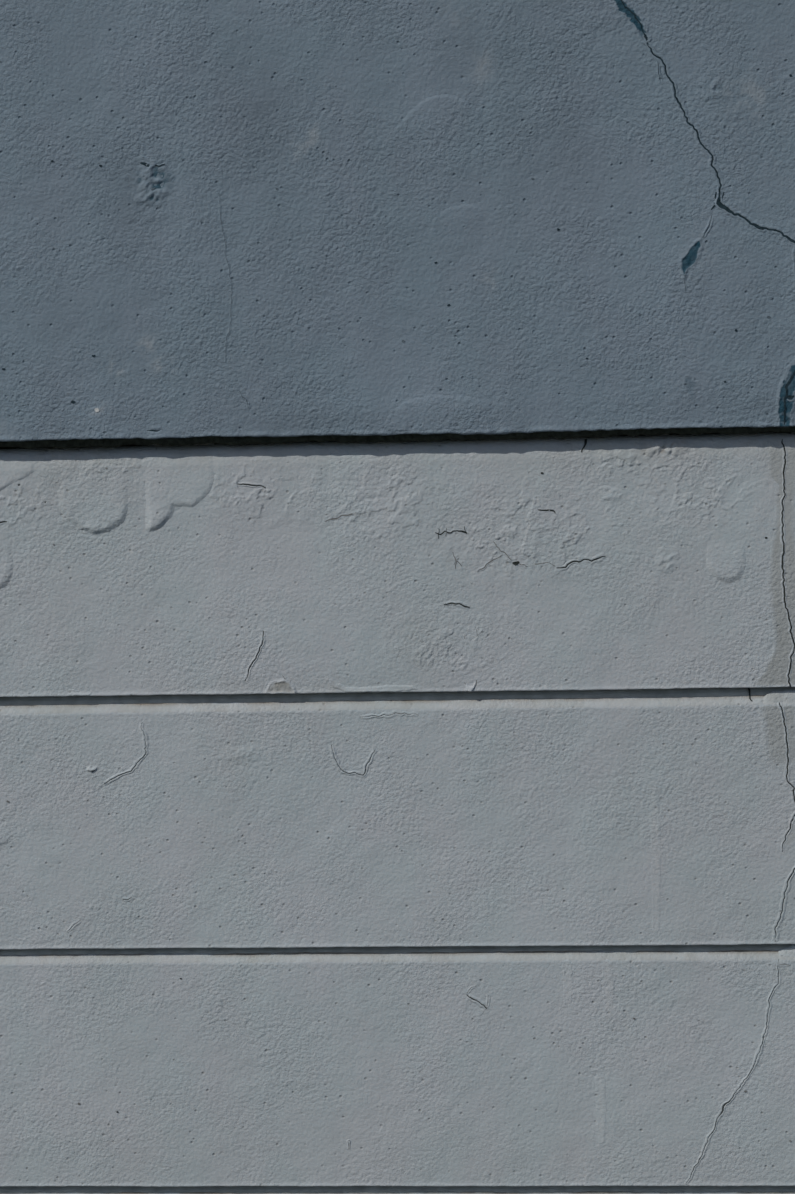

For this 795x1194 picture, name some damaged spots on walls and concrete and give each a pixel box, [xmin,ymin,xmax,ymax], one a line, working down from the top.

crack [611,0,795,296]
peeling [0,426,795,597]
crack [684,358,795,1185]